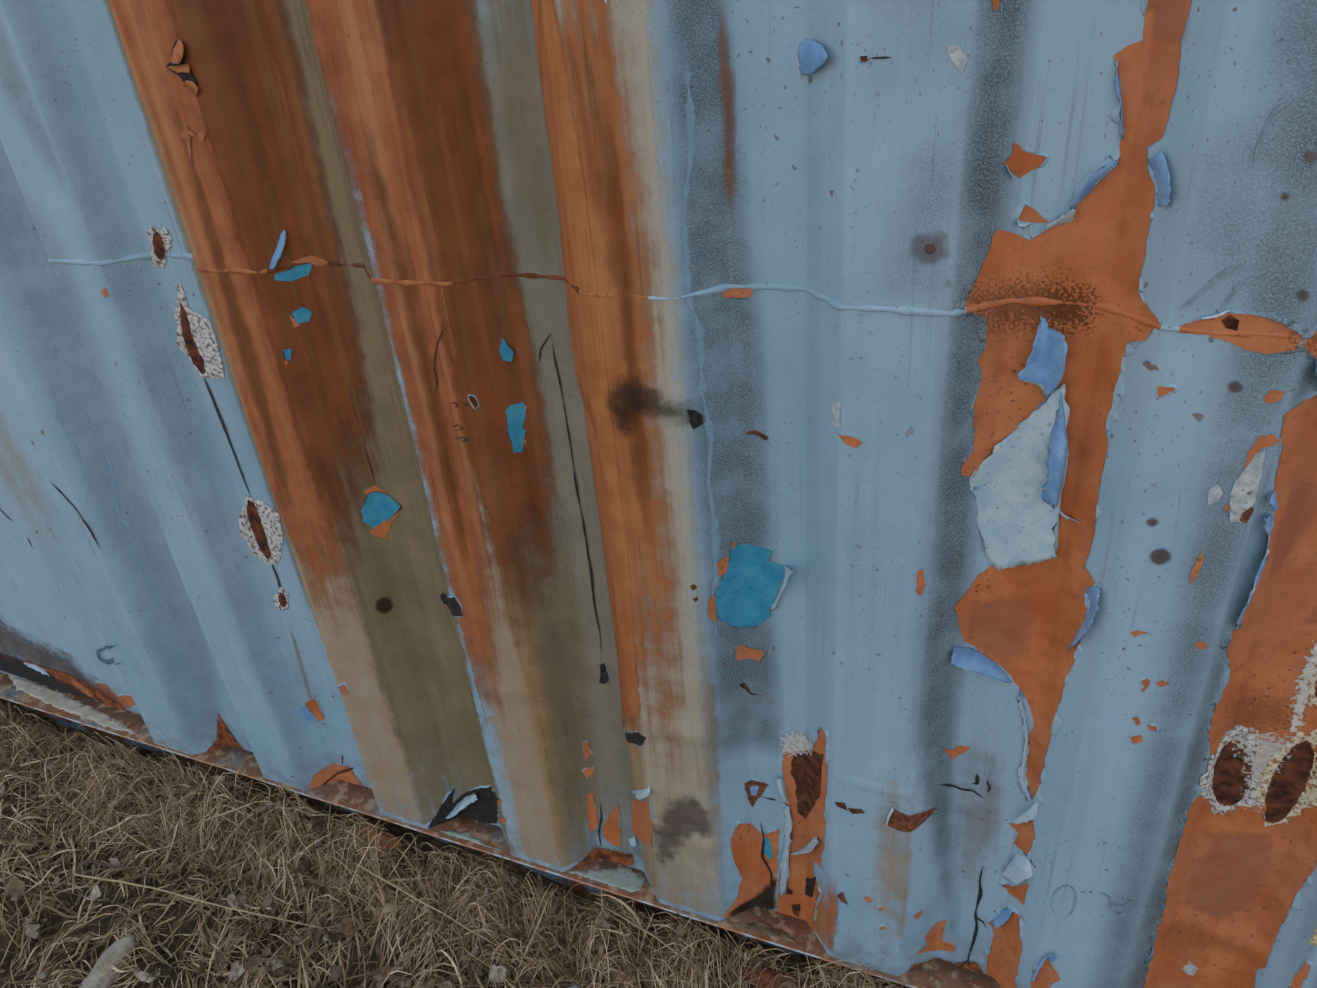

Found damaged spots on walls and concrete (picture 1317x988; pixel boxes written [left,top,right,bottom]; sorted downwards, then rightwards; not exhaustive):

corrosion [720,36,733,191]
peeling [269,230,328,281]
peeling [1180,308,1317,373]
corrosion [108,0,716,890]
peeling [951,0,1191,988]
peeling [690,542,793,628]
corrosion [0,652,125,710]
peeling [1143,390,1317,988]
corrosion [1306,675,1317,706]
corrosion [1200,725,1317,827]
peeling [723,726,888,932]
peeling [915,920,956,954]